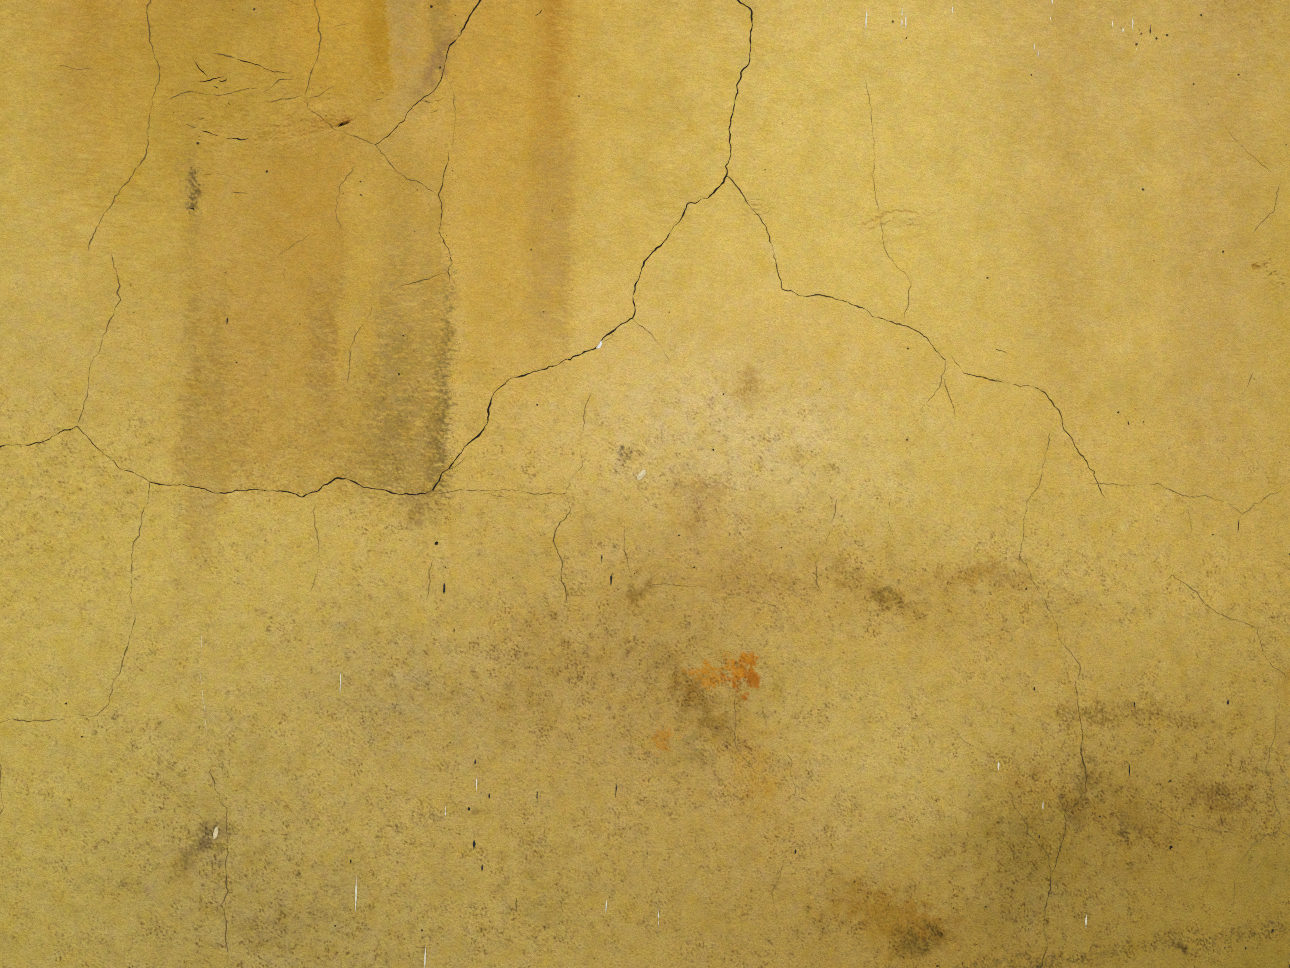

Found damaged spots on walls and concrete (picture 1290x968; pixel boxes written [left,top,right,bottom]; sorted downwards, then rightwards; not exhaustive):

damp [149,0,471,689]
crack [0,0,1281,716]
damp [815,546,950,635]
damp [635,624,742,789]
corrosion [672,645,778,704]
damp [479,804,615,959]
damp [917,732,1290,968]